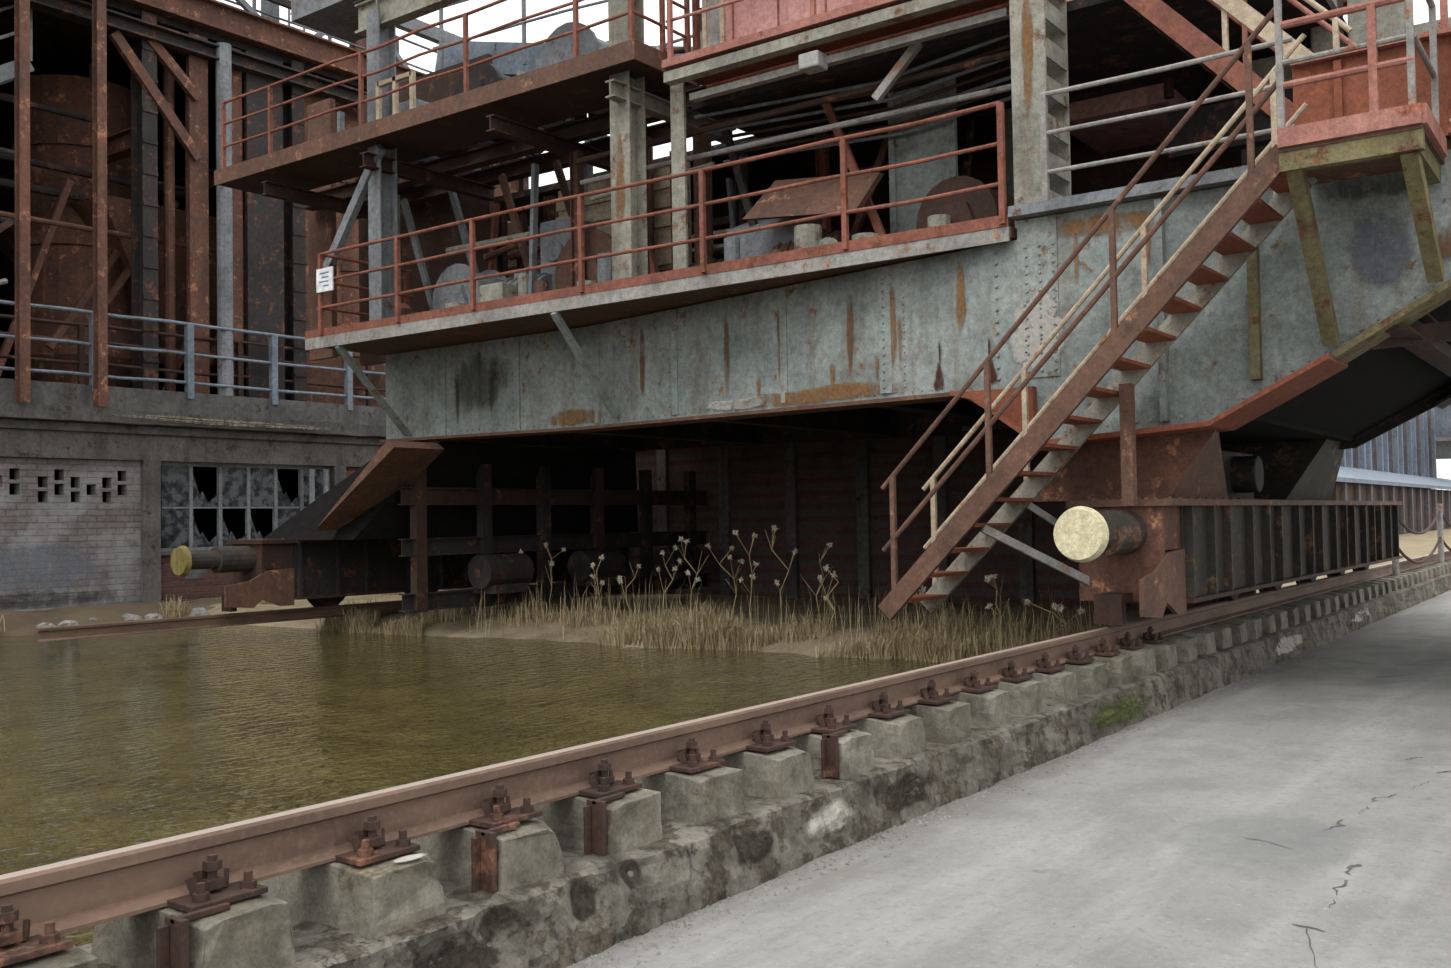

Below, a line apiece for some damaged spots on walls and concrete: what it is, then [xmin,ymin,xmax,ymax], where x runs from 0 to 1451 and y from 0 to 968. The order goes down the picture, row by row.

corrosion [956,265,965,326]
corrosion [755,290,901,406]
corrosion [934,343,944,390]
damp [808,801,848,836]
crack [1294,880,1348,932]